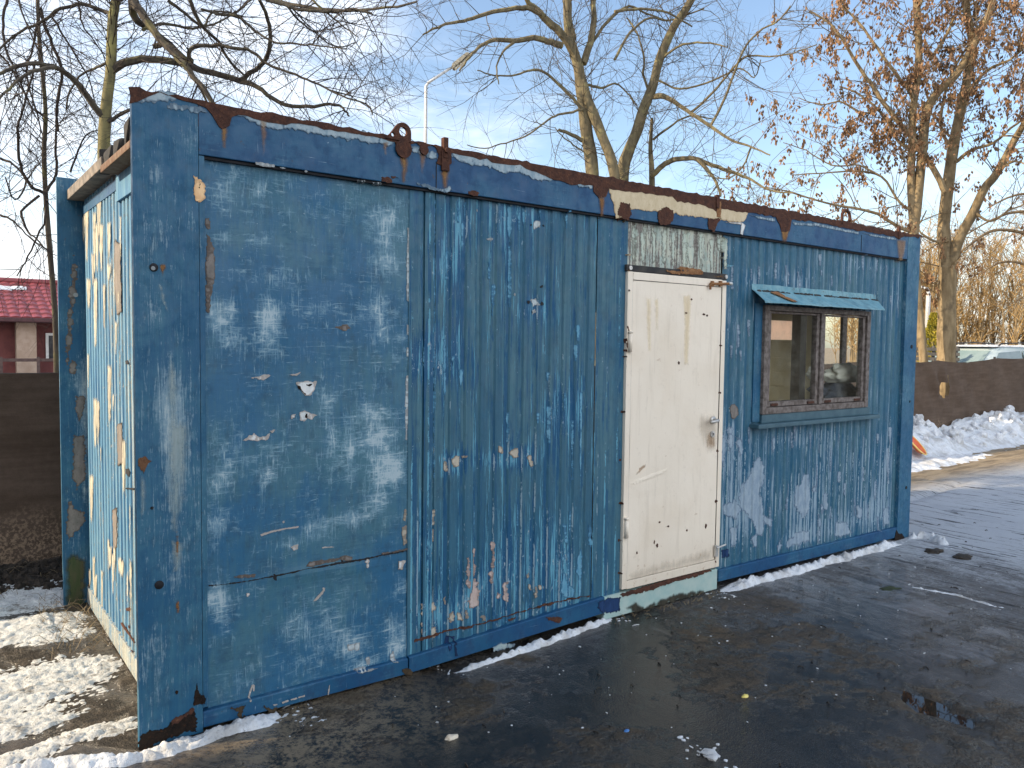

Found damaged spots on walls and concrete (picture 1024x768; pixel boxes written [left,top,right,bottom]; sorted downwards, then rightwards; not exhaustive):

peeling [193,175,206,202]
rust [128,87,923,241]
rust [666,266,708,287]
peeling [65,202,125,489]
peeling [291,372,317,396]
peeling [65,476,93,541]
peeling [722,426,892,553]
water stain [66,555,85,606]
peeling [88,506,132,617]
peeling [420,504,592,638]
rust [620,549,729,597]
rust [414,595,590,643]